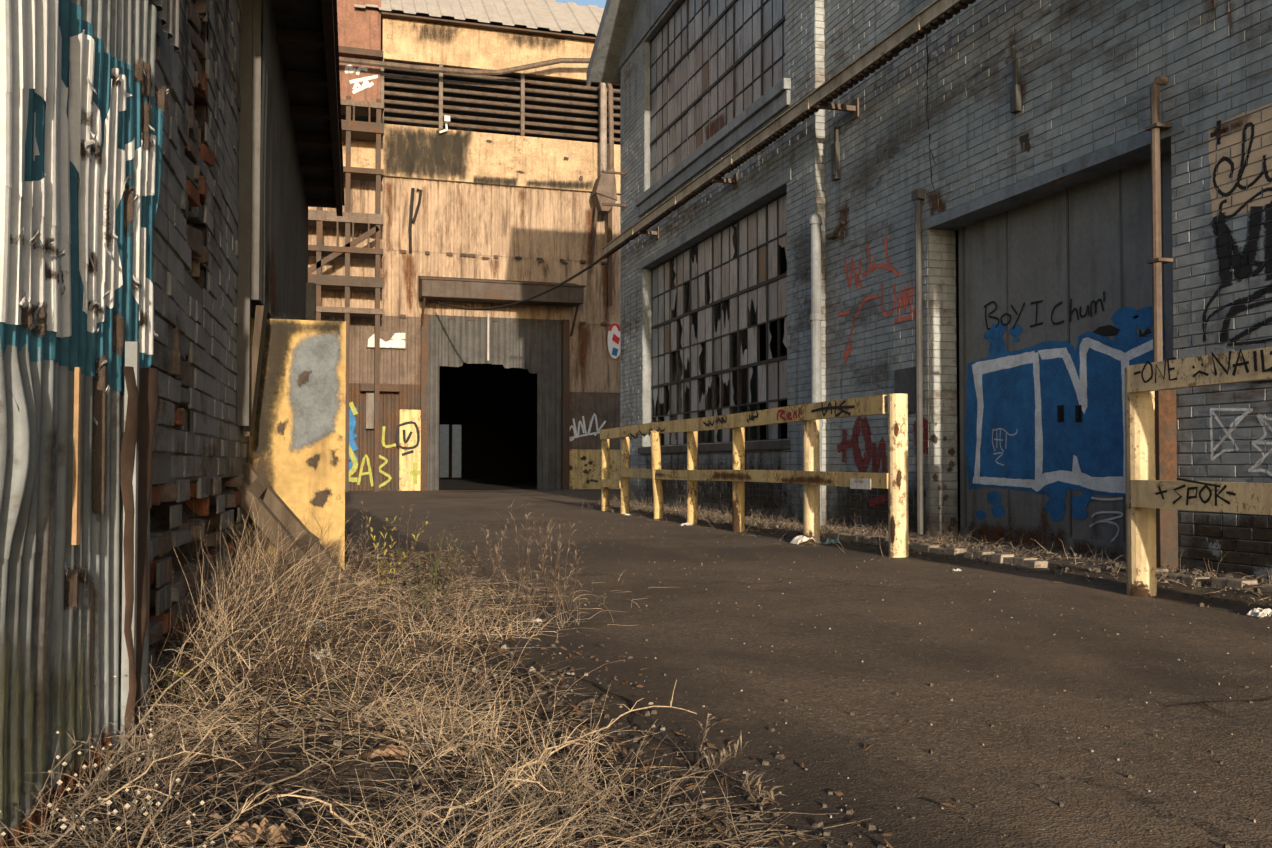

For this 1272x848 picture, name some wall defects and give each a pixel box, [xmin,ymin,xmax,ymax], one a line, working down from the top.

peeling [80,74,102,164]
peeling [111,57,169,154]
spalling [181,0,215,290]
leakage [384,127,592,189]
peeling [10,225,66,296]
peeling [88,175,139,275]
rust [928,192,946,216]
peeling [17,289,47,335]
peeling [277,332,341,469]
peeling [310,488,332,507]
rust [971,512,1123,557]
crack [1167,698,1272,723]